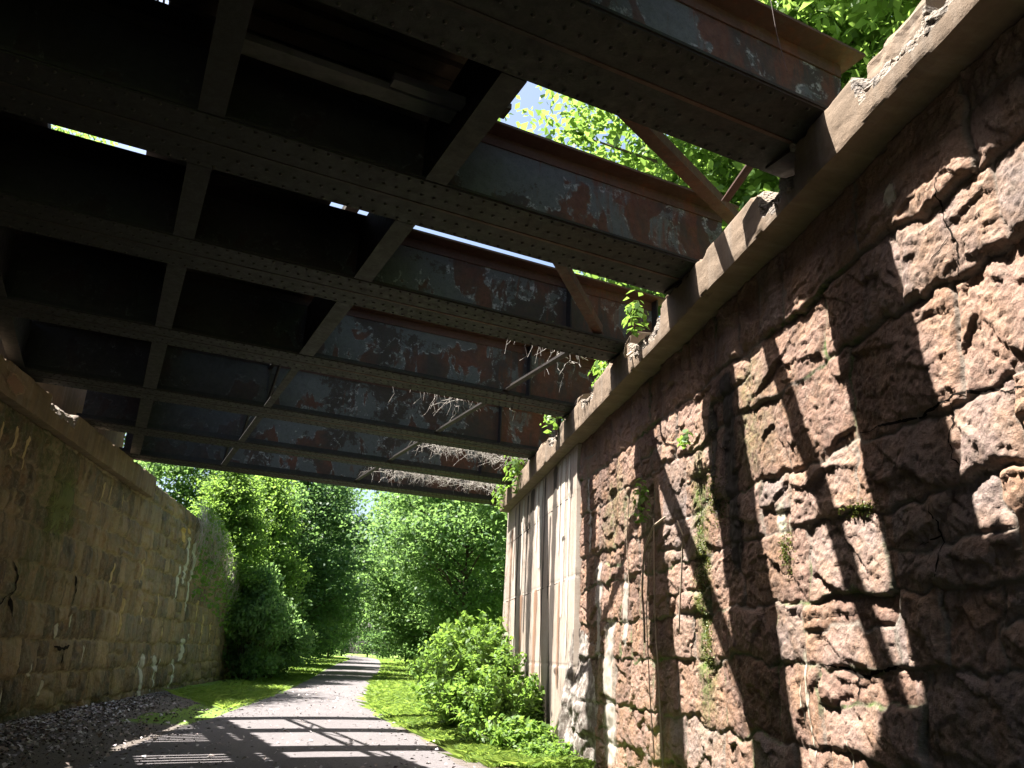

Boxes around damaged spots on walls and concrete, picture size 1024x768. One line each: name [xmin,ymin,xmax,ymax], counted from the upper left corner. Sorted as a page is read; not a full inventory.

spalling [848,0,953,105]
crack [929,177,964,284]
crack [0,563,19,616]
water stain [135,537,212,696]